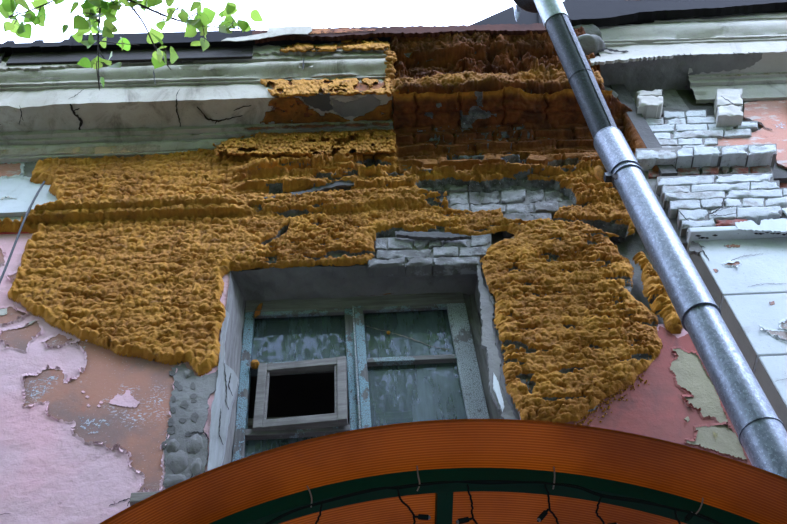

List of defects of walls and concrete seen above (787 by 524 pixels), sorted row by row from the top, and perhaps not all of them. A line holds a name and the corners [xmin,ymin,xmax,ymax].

spalling [0,61,85,71]
spalling [253,30,592,144]
crack [69,89,84,130]
crack [197,105,251,124]
peeling [0,161,38,180]
spalling [635,109,787,256]
spalling [420,184,573,225]
peeling [713,259,742,273]
spalling [367,234,518,420]
peeling [759,317,787,342]
peeling [0,304,218,492]
flaking render [567,326,752,465]